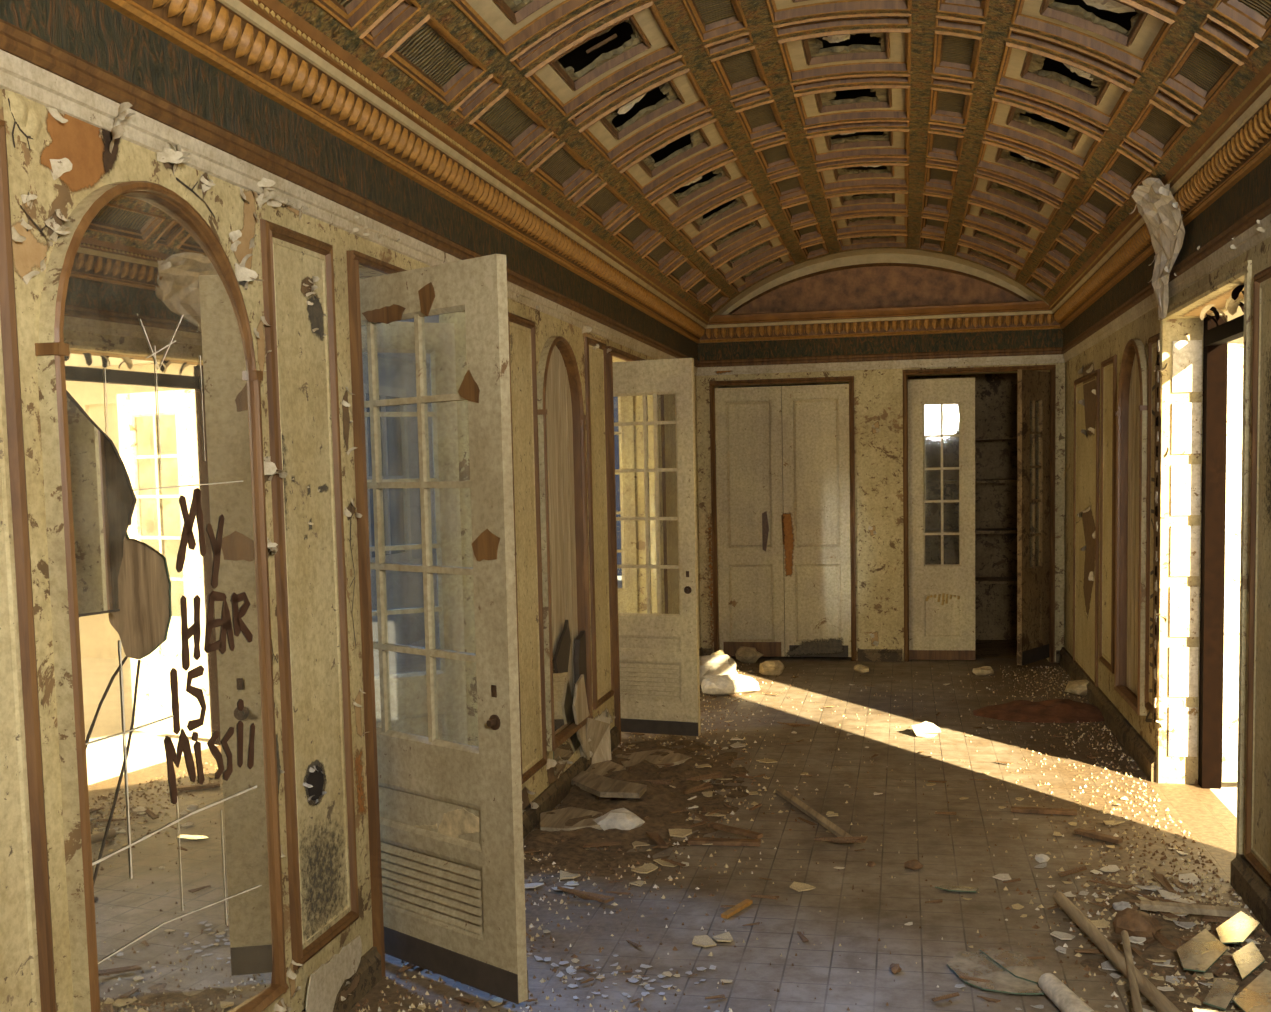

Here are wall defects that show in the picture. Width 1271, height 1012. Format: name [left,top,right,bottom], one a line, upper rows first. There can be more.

peeling [40,102,135,192]
flaking render [1129,178,1200,320]
peeling [1182,283,1244,326]